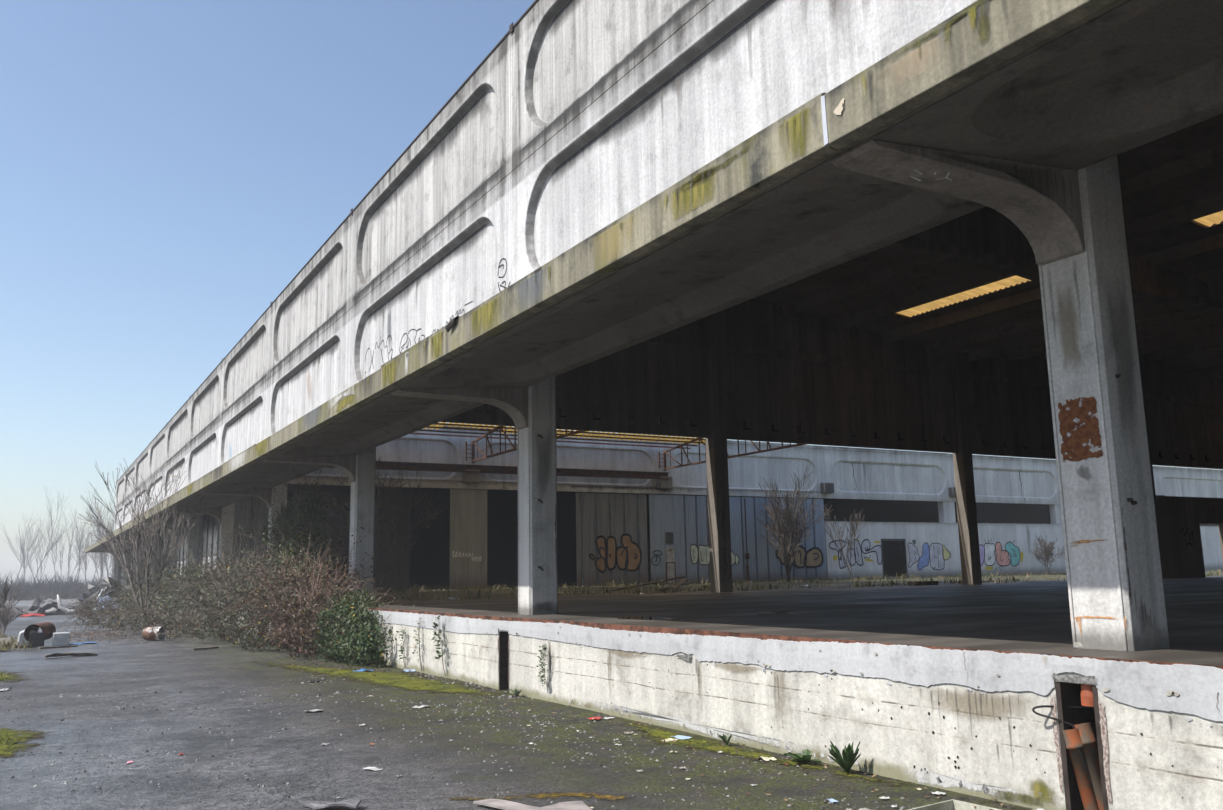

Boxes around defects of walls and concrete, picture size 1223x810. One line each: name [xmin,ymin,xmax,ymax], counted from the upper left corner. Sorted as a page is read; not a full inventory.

damp [521,267,550,300]